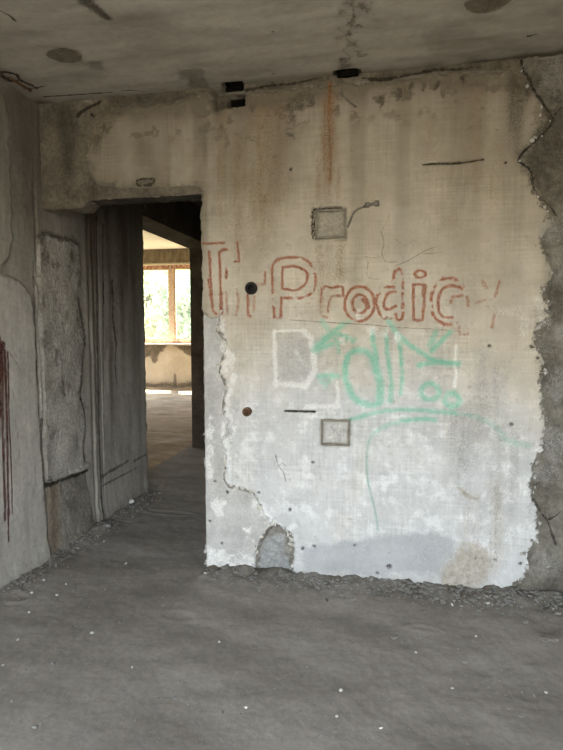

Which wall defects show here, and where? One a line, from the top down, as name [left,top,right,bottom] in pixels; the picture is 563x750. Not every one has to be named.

flaking render [35,1,563,591]